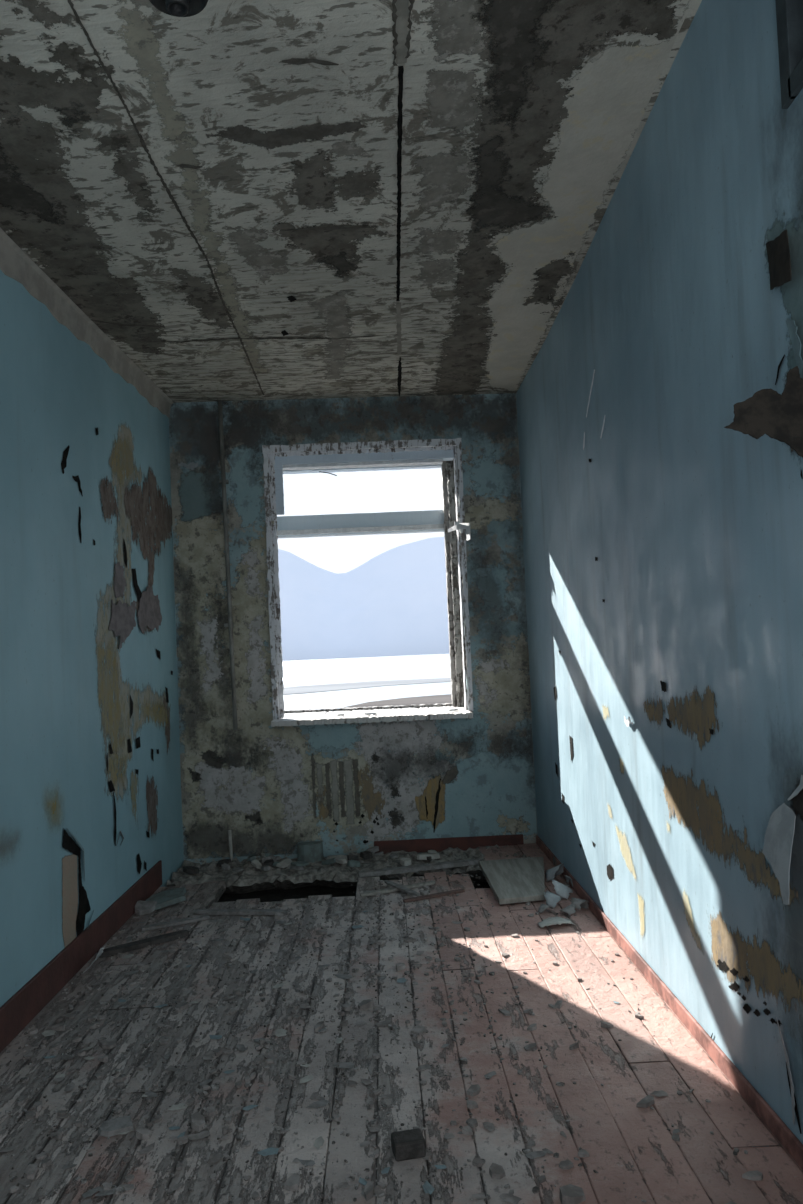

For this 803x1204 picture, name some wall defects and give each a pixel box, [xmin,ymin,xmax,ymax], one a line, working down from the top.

peeling [724,213,803,479]
flaking render [94,424,537,859]
peeling [643,681,719,751]
peeling [62,828,94,947]
peeling [607,806,636,880]
peeling [661,764,803,907]